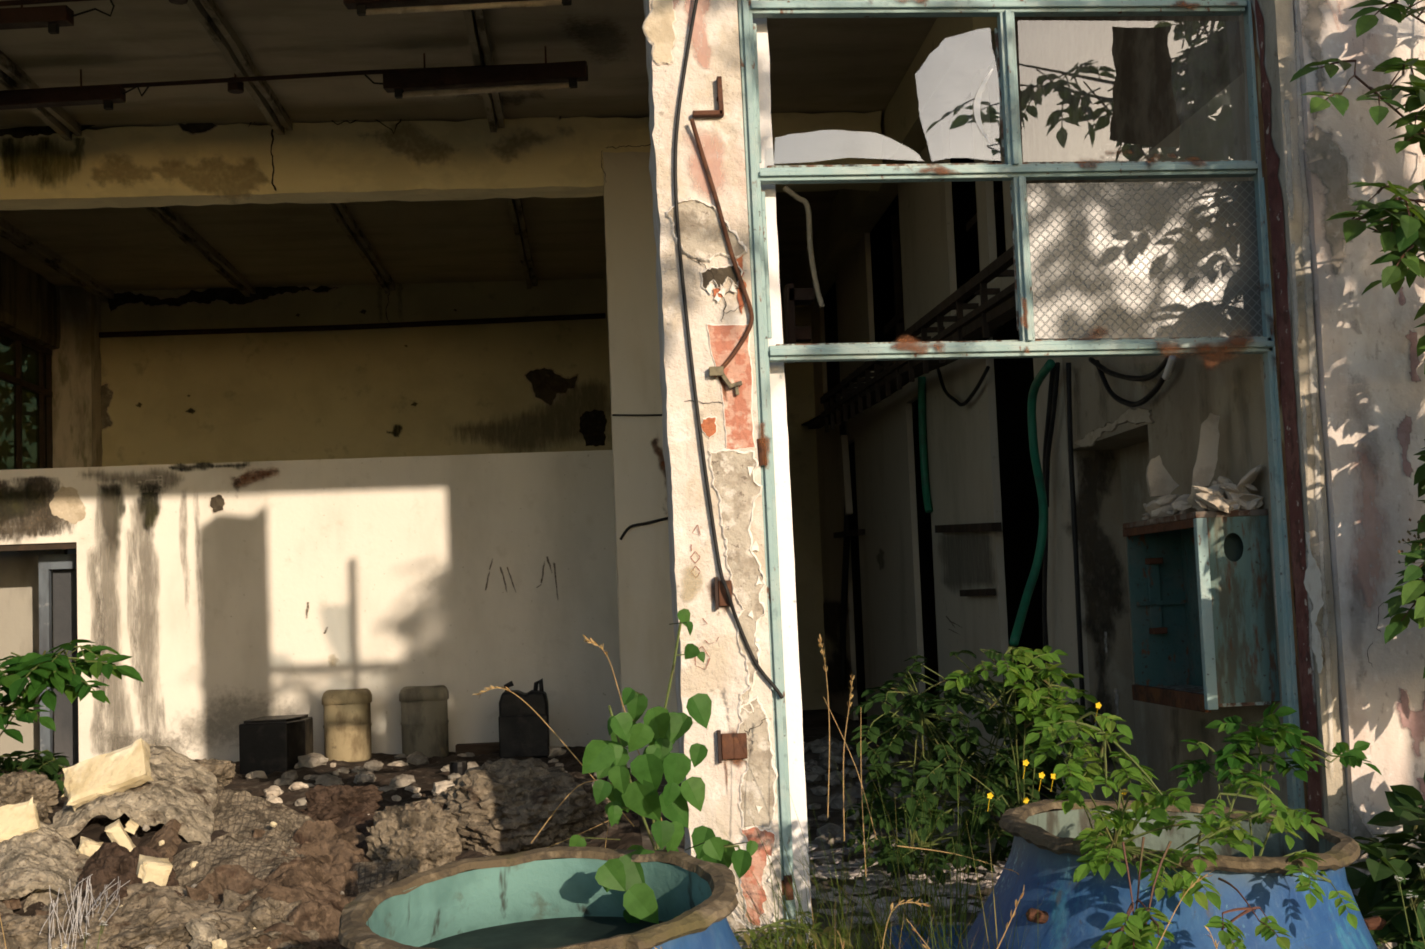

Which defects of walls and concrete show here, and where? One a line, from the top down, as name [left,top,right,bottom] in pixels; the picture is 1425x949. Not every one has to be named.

flaking render [642,0,710,68]
damp [3,138,80,184]
spalling [100,285,342,313]
spalling [523,366,579,407]
corrosion [1157,333,1252,367]
corrosion [1230,2,1304,745]
hole [579,409,607,447]
damp [0,476,71,541]
spalling [49,486,86,524]
spalling [665,135,780,949]
damp [85,462,247,750]
damp [1067,450,1123,767]